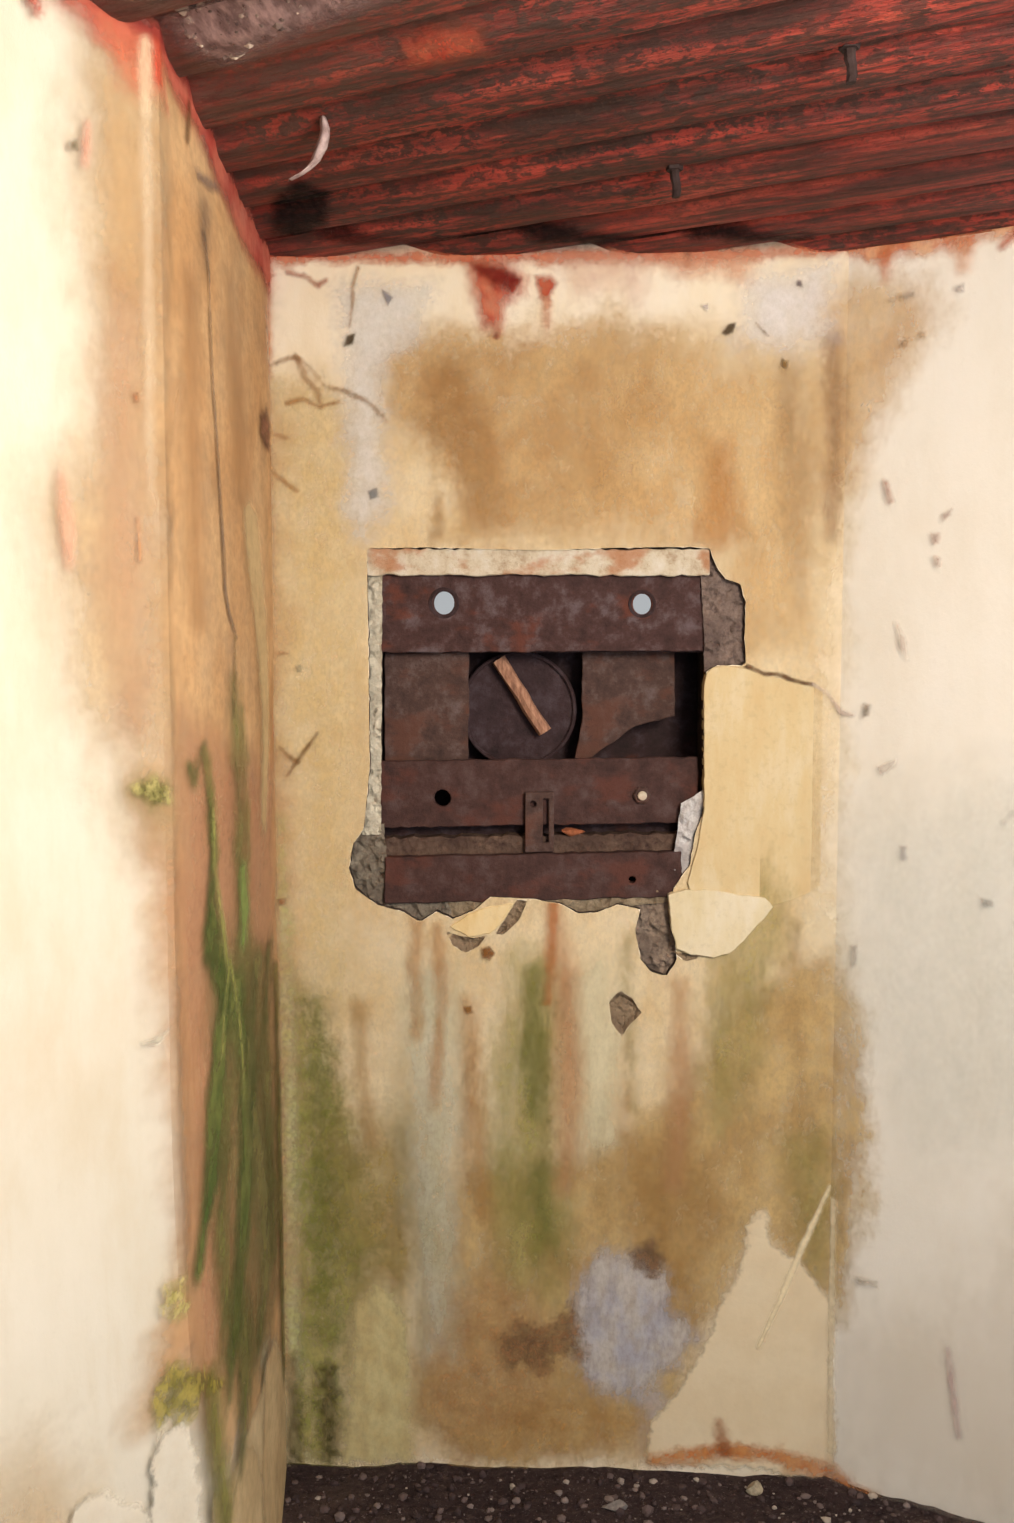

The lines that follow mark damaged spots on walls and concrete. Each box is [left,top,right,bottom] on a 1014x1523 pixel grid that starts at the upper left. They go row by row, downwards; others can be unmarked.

corrosion [66,0,1014,372]
crack [204,236,238,639]
damp [60,41,916,1464]
flaking render [546,791,773,974]
crack [744,664,847,715]
peeling [70,1345,287,1523]
peeling [500,1185,836,1478]